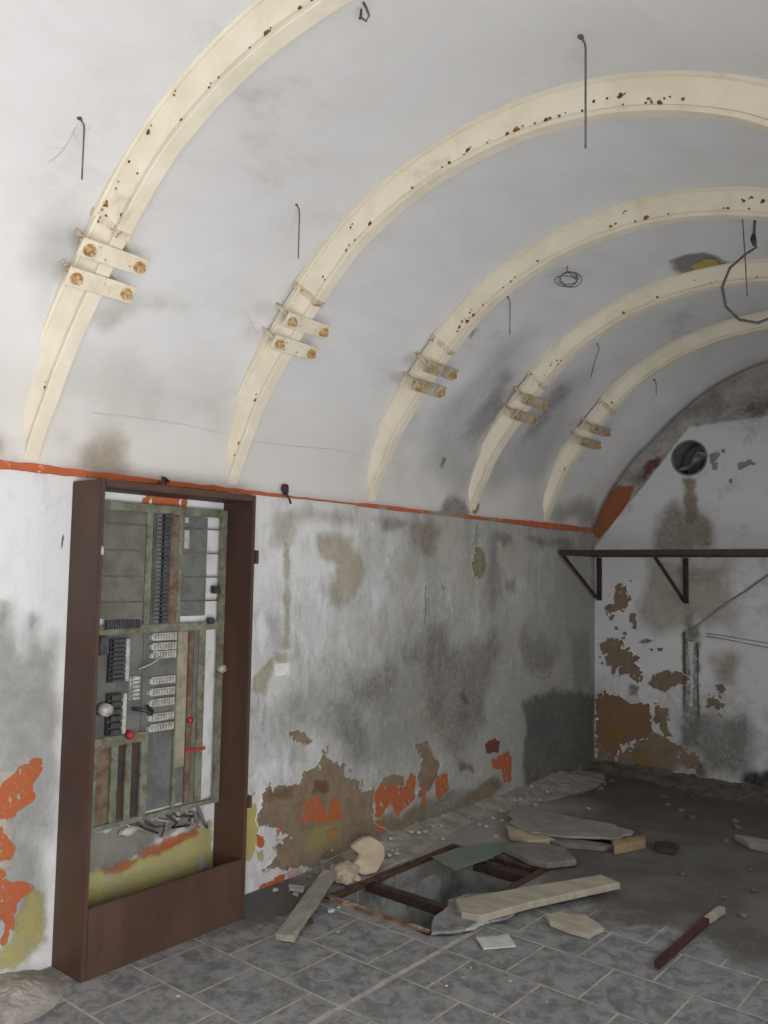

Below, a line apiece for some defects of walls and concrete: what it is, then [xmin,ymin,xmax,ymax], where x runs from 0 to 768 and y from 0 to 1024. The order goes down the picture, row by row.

spalling [595,458,660,540]
peeling [0,758,45,969]
peeling [246,728,512,893]
damp [524,692,594,784]
peeling [595,579,704,776]